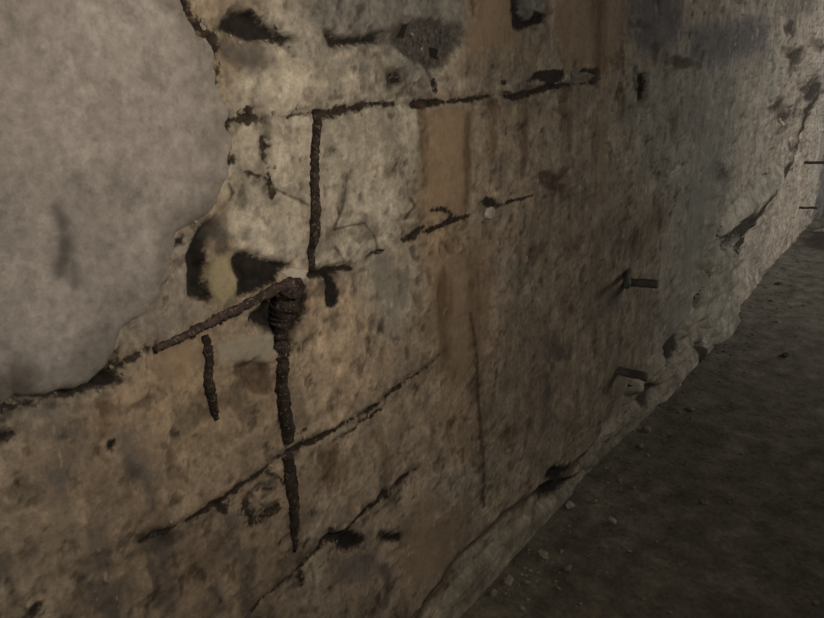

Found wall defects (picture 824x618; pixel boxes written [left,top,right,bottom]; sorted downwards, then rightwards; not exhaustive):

spalling [385,64,408,87]
spalling [389,19,460,68]
spalling [720,215,756,251]
spalling [152,109,352,552]
crack [138,354,439,542]
crack [251,468,417,611]